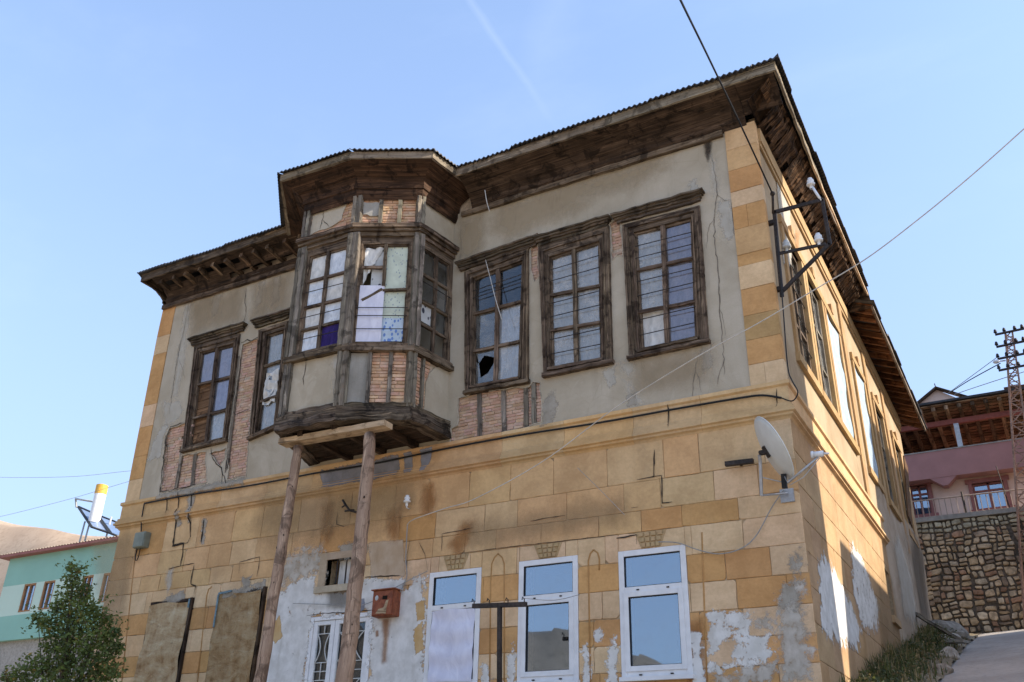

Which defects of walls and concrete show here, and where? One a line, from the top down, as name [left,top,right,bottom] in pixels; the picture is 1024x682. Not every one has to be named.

crack [667,161,734,425]
crack [159,322,207,591]
spalling [161,338,258,492]
spalling [449,381,542,442]
crack [638,450,670,503]
peeling [267,545,346,682]
peeling [362,540,429,682]
peeling [579,628,621,682]
peeling [691,542,880,682]